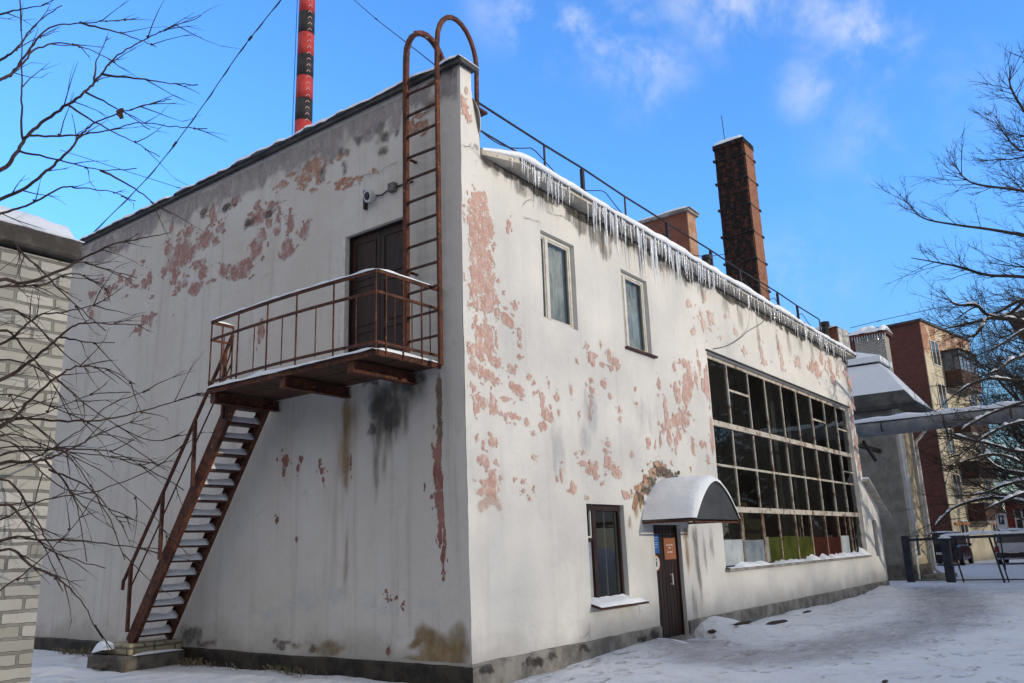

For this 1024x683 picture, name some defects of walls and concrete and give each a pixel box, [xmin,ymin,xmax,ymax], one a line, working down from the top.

peeling [79,152,378,337]
peeling [276,448,303,481]
peeling [424,375,448,582]
peeling [473,431,535,511]
peeling [463,184,623,436]
peeling [556,461,589,500]
peeling [575,289,861,511]
damp [408,627,465,663]